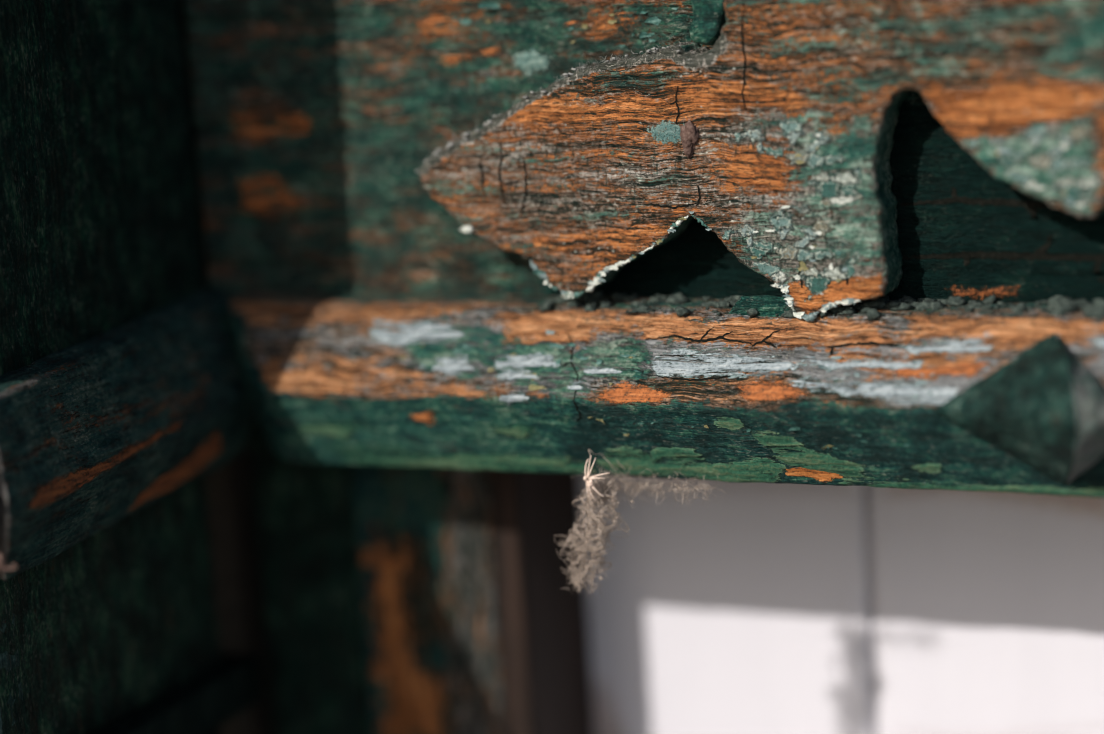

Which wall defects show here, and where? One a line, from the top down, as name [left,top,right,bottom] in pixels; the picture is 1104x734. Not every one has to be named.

peeling [423,2,501,26]
peeling [608,11,661,47]
crack [668,86,680,124]
peeling [969,117,1100,209]
peeling [530,115,862,322]
peeling [951,285,1019,299]
peeling [368,318,670,405]
crack [645,327,780,381]
peeling [728,339,994,406]